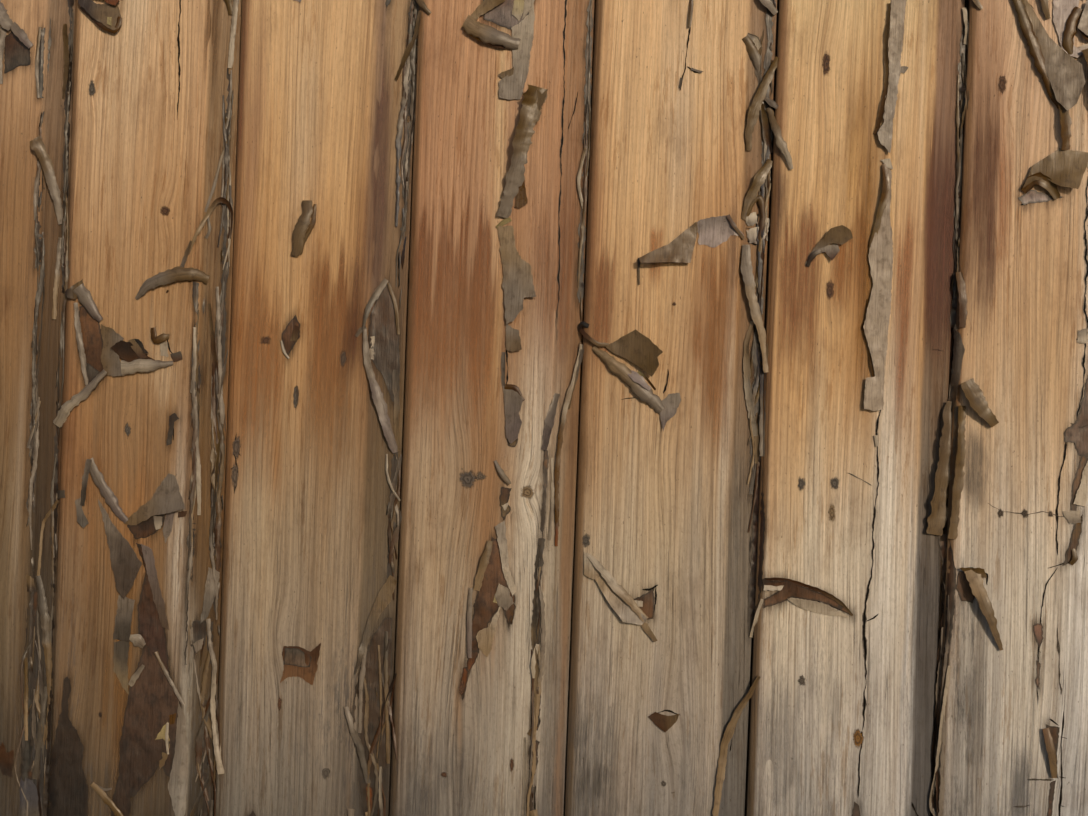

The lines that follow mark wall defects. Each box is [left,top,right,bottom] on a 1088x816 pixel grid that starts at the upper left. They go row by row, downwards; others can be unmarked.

peeling [0,1,69,98]
peeling [0,135,233,816]
crack [175,0,183,117]
peeling [355,278,400,501]
peeling [460,460,517,700]
peeling [462,0,548,447]
peeling [540,321,681,546]
peeling [637,33,853,637]
crack [848,410,881,797]
peeling [861,0,908,411]
peeling [1012,0,1088,205]
peeling [1049,378,1088,568]